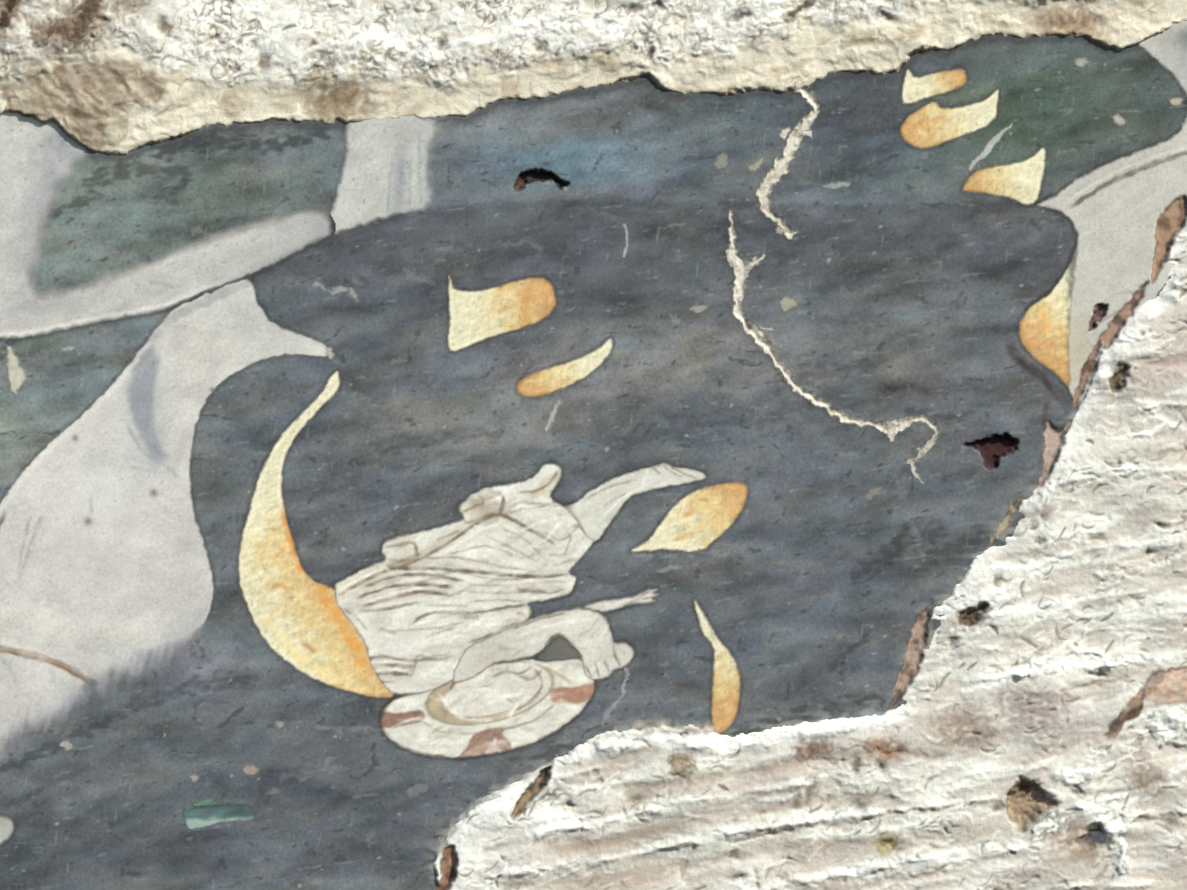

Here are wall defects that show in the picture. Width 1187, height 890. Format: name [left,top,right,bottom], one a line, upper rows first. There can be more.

damp [0,0,16,27]
spalling [2,61,164,153]
peeling [780,297,797,311]
crack [726,79,939,483]
spalling [1074,196,1187,405]
peeling [7,347,26,394]
spalling [1038,422,1071,487]
spalling [890,604,932,707]
spalling [1107,667,1187,737]
peeling [184,799,254,829]
spalling [437,785,509,890]
spalling [511,763,553,819]